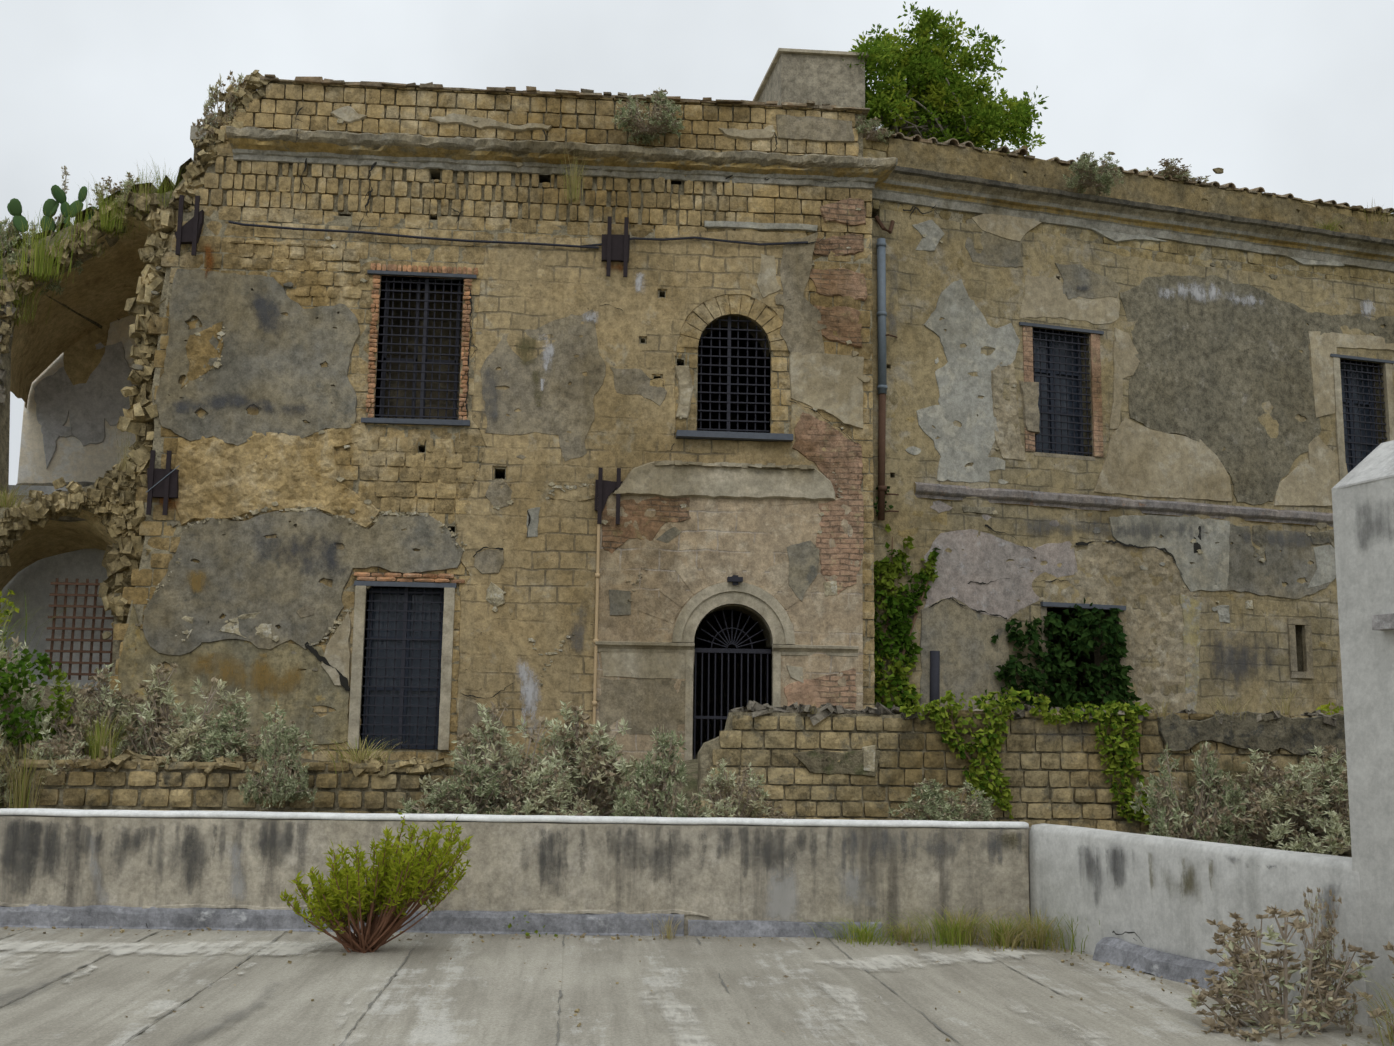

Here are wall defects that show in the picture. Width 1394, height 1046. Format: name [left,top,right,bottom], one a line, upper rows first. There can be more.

spalling [16,70,693,646]
spalling [991,362,1040,461]
crack [925,524,1081,619]
crack [1076,540,1182,575]
water stain [1079,849,1123,883]
water stain [1183,860,1213,890]